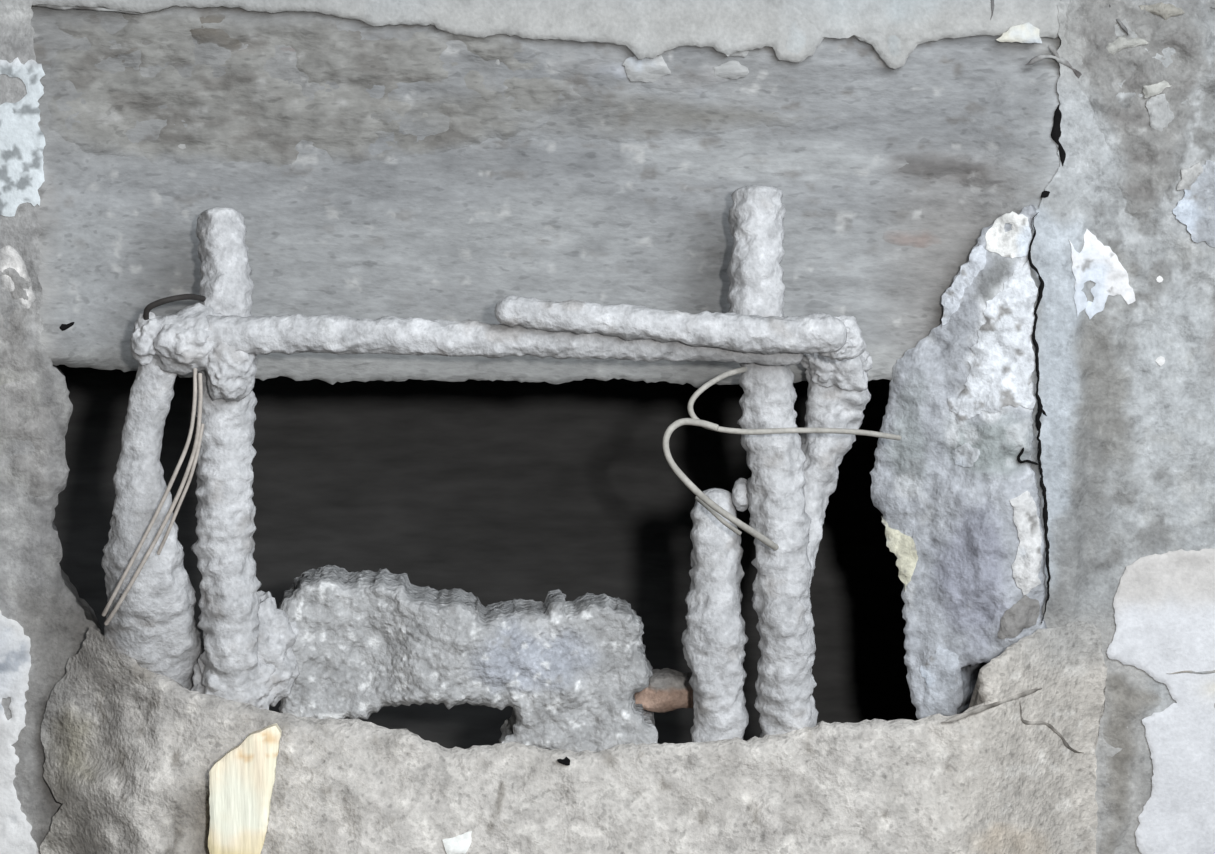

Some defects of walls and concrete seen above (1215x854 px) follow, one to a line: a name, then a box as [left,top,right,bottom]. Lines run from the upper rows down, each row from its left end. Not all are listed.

spalling [0,8,749,224]
peeling [996,22,1042,43]
spalling [0,245,65,517]
spalling [101,185,872,743]
crack [1017,104,1066,621]
peeling [1069,229,1136,319]
peeling [0,610,39,854]
peeling [1098,548,1215,854]